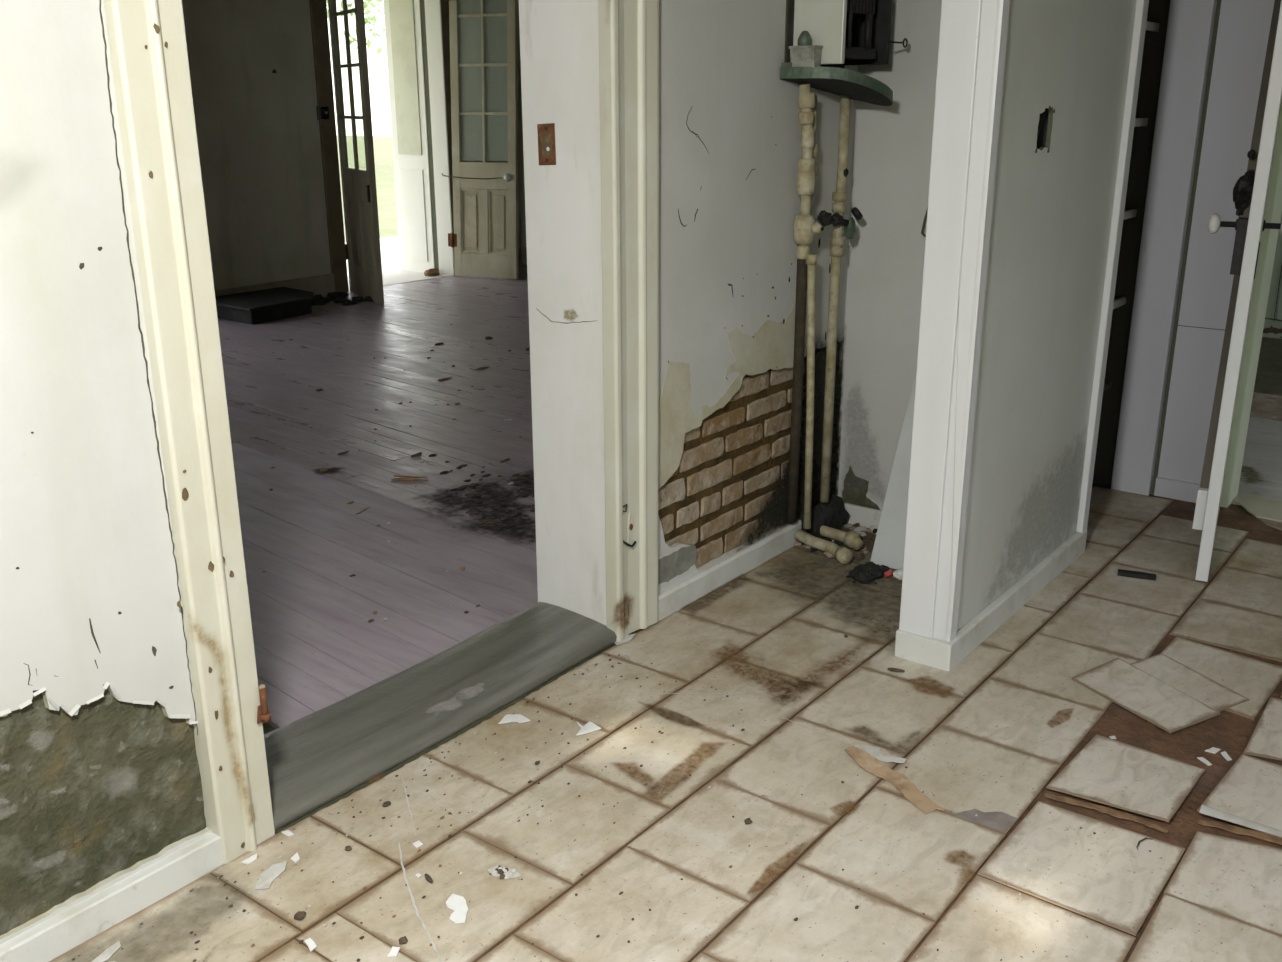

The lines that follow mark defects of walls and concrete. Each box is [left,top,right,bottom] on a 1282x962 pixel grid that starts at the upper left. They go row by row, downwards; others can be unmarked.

flaking render [658,287,827,569]
crack [89,618,101,669]
rust [221,678,230,737]
peeling [1197,747,1232,766]
peeling [0,682,207,936]
rust [234,762,254,822]
peeling [91,941,121,962]